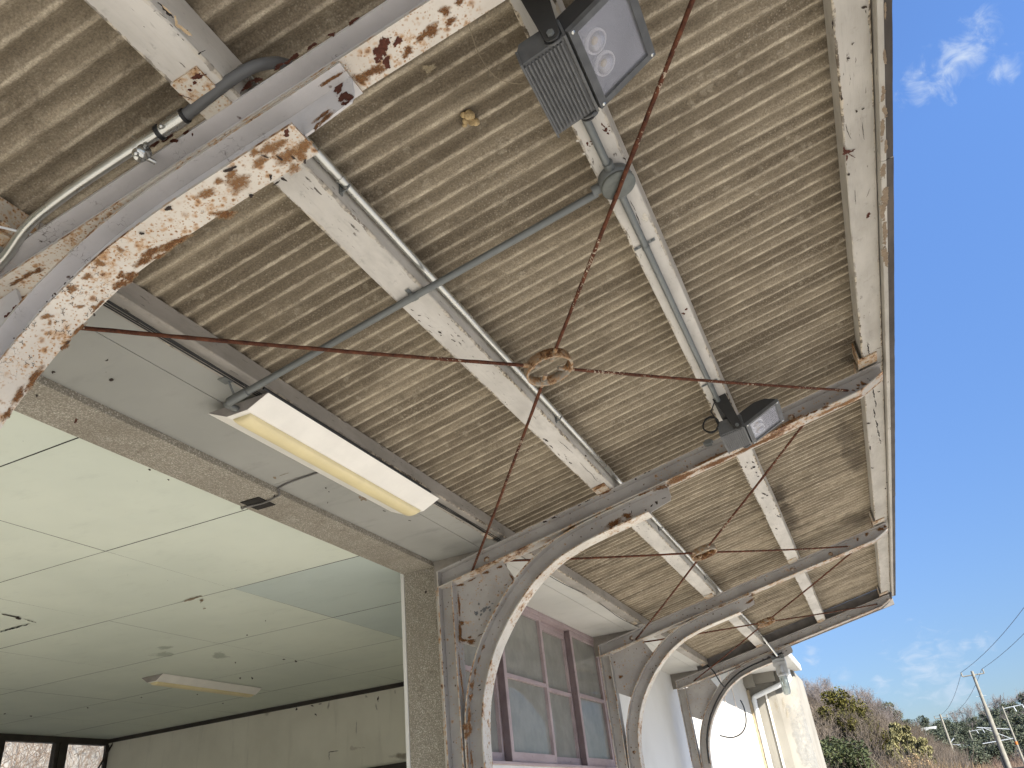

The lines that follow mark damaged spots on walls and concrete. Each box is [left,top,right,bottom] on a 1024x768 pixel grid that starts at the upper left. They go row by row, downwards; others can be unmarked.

corrosion [318,65,387,87]
corrosion [192,110,333,199]
peeling [879,86,889,267]
corrosion [213,211,235,220]
corrosion [10,267,44,286]
corrosion [67,259,106,294]
corrosion [112,235,191,290]
corrosion [2,365,44,422]